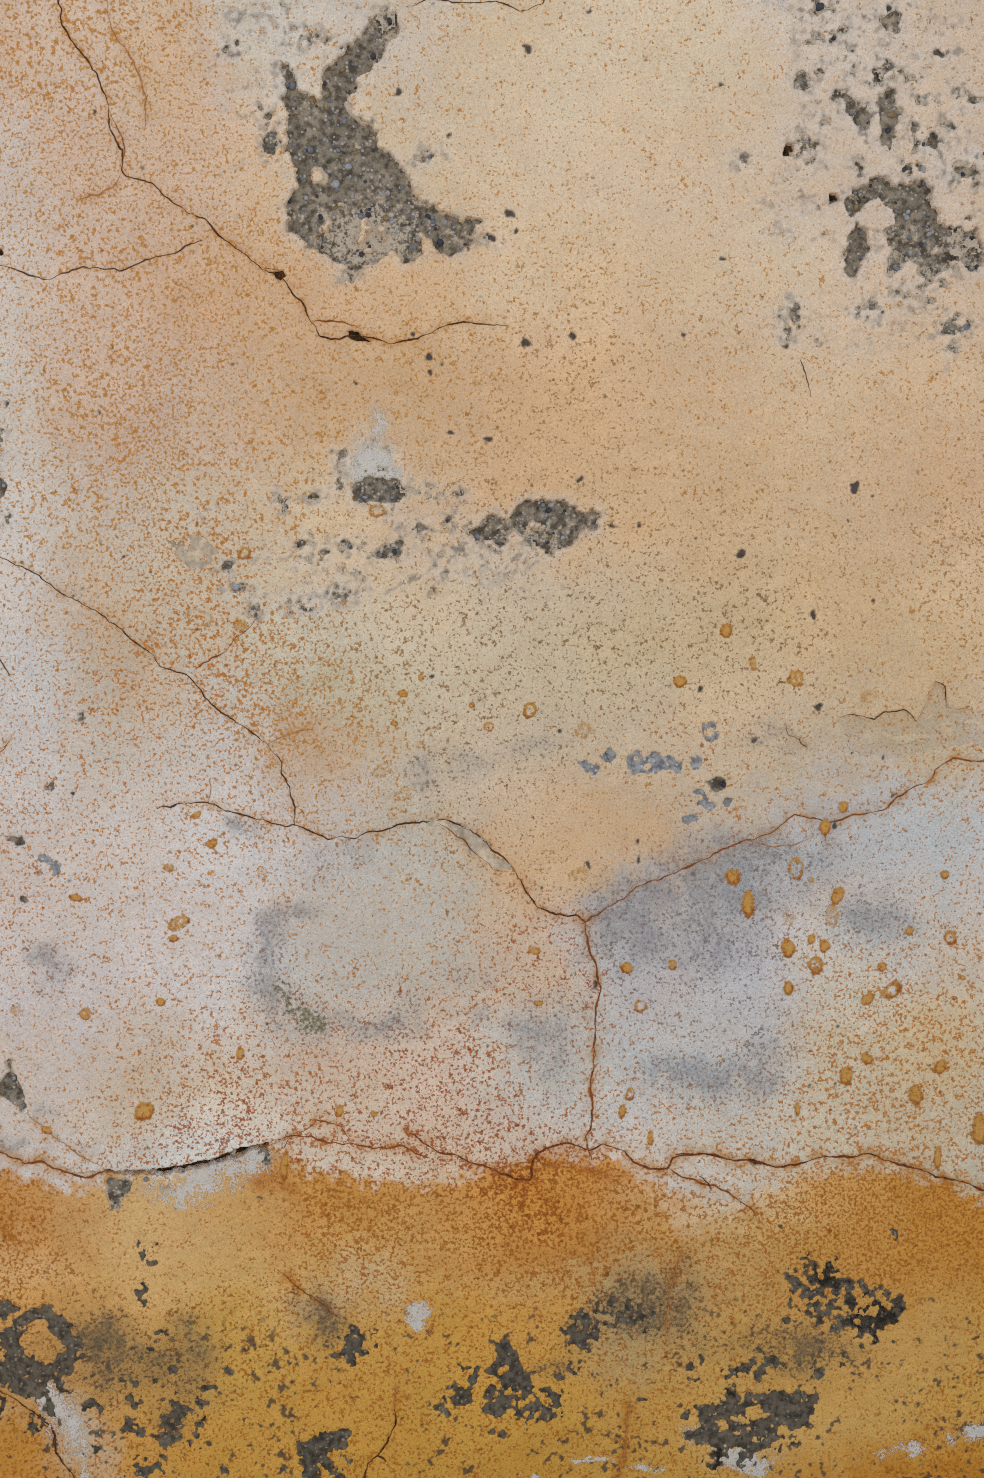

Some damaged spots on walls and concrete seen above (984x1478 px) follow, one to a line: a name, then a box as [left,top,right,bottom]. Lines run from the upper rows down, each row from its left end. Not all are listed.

crack [0,0,507,344]
spalling [258,8,491,283]
spalling [783,120,829,171]
spalling [804,0,984,317]
spalling [275,450,463,514]
spalling [285,499,600,613]
crack [0,557,984,1221]
peeling [0,1299,234,1478]
peeling [134,1240,159,1307]
peeling [280,1428,353,1478]
peeling [433,1294,664,1439]
peeling [678,1252,906,1474]